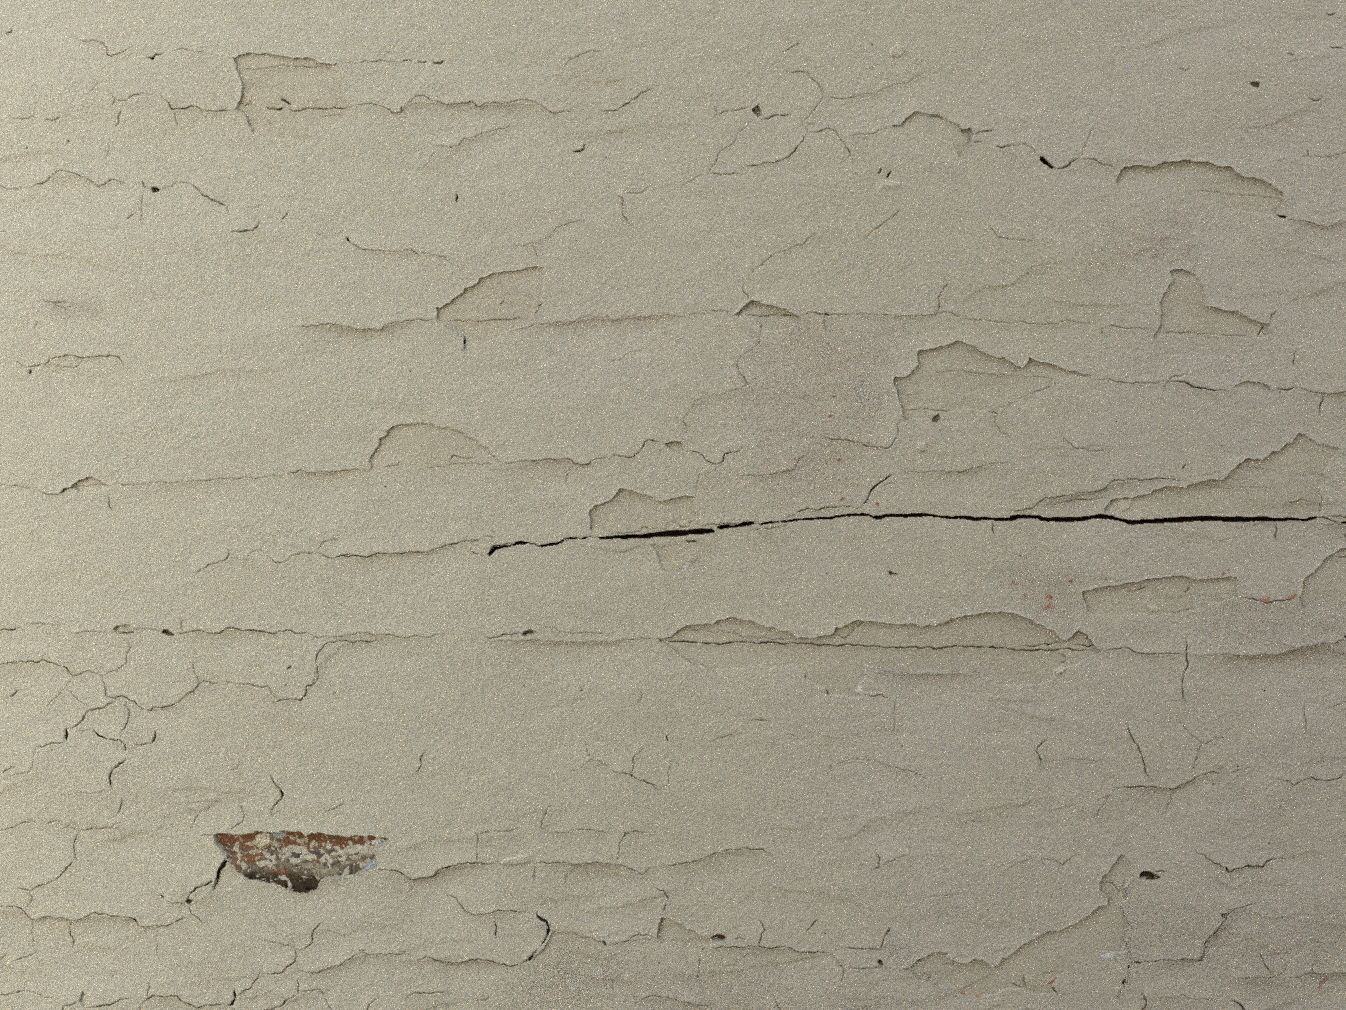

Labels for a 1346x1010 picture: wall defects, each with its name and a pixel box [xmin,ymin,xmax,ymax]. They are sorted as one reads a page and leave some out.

peeling [433,264,545,353]
peeling [891,338,1093,423]
peeling [1102,432,1340,517]
crack [197,513,1346,572]
peeling [1079,574,1240,618]
peeling [657,609,1105,699]
crack [1,623,770,1010]
spalling [211,830,390,893]
crack [612,919,896,1006]